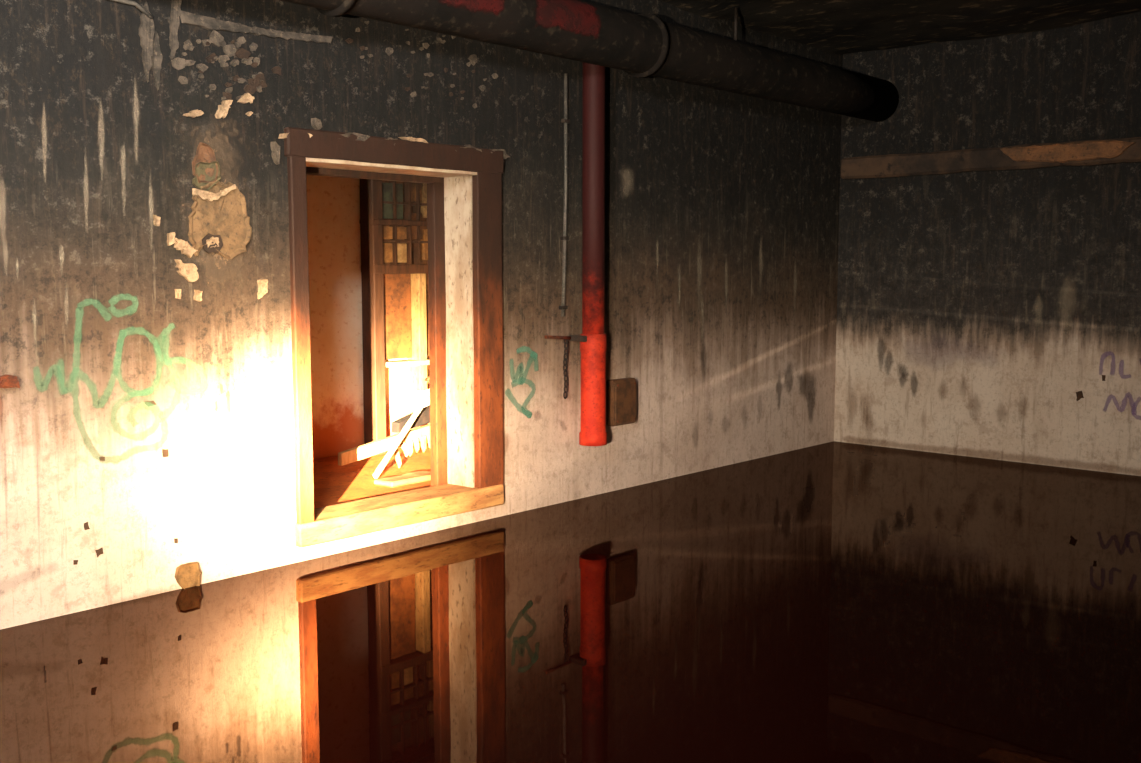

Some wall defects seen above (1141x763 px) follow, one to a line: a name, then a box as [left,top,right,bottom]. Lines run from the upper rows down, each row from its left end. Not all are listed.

flaking render [405,29,456,58]
flaking render [404,54,498,108]
spalling [139,0,394,306]
flaking render [386,137,428,146]